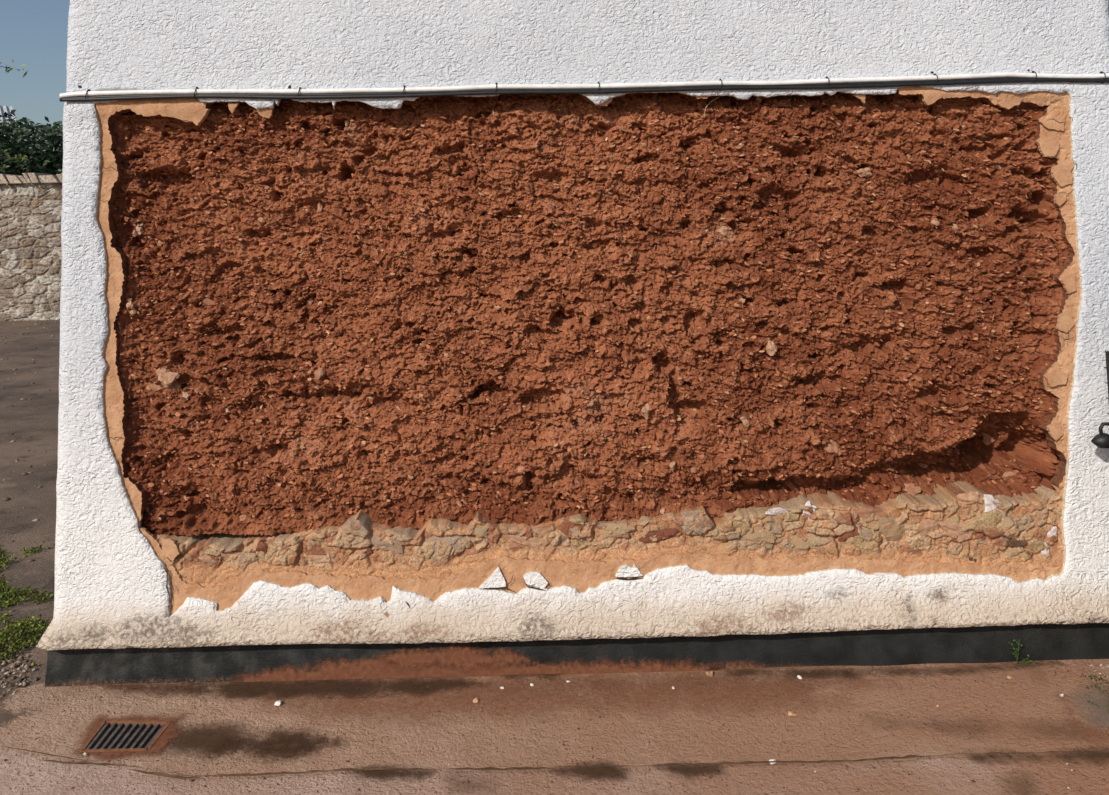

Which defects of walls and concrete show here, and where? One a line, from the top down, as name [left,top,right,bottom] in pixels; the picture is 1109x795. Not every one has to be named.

spalling [95,86,1081,616]